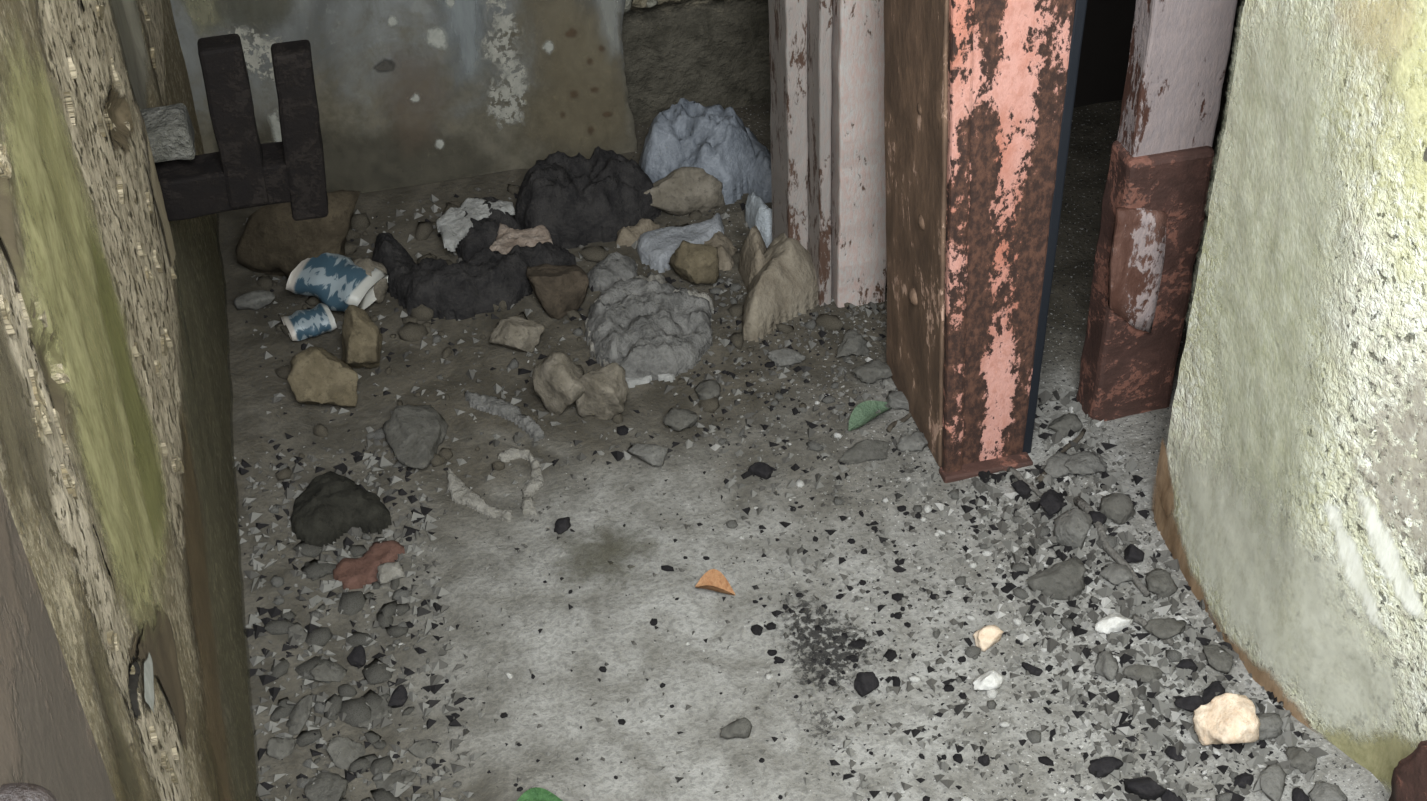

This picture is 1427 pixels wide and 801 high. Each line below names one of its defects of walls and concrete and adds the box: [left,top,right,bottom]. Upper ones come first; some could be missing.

peeling [599,0,684,47]
peeling [0,130,192,801]
damp [34,86,165,567]
damp [92,640,150,801]
damp [172,215,257,801]